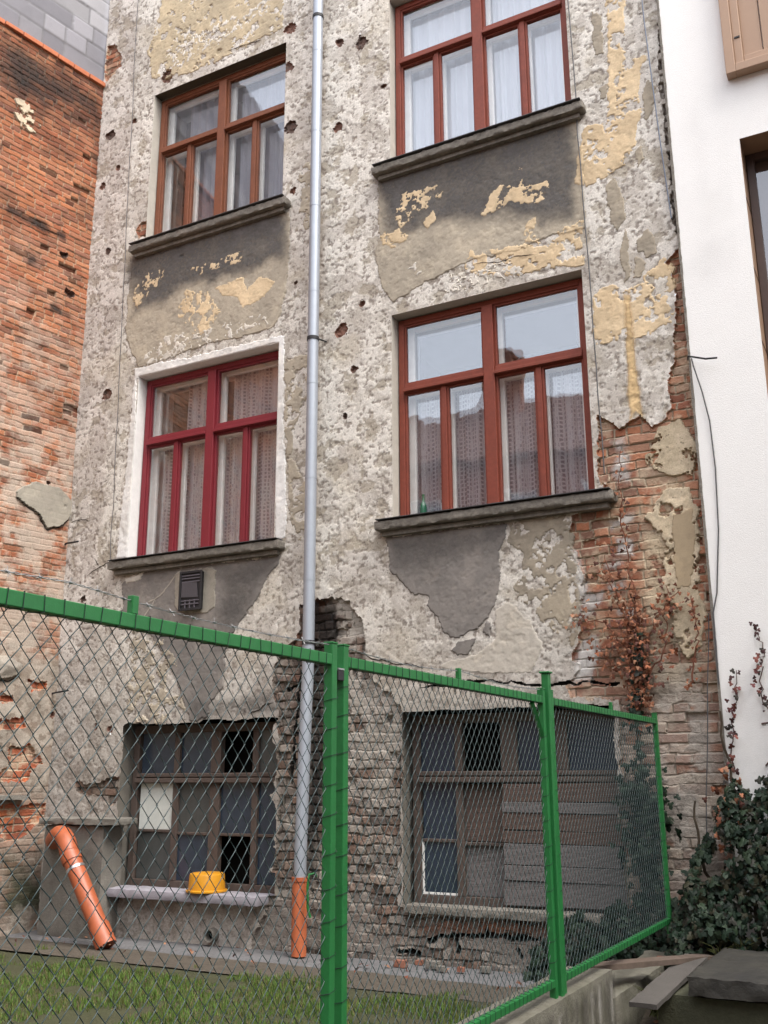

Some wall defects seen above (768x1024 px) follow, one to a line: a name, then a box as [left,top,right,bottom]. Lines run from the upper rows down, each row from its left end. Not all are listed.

peeling [380,185,443,248]
peeling [481,168,549,217]
peeling [132,270,164,309]
peeling [191,252,242,275]
peeling [444,216,585,293]
peeling [143,277,275,367]
spalling [566,23,733,922]
crack [365,655,620,688]
spalling [0,743,43,783]
spalling [0,802,46,842]
spalling [251,657,324,955]
spalling [288,596,547,973]